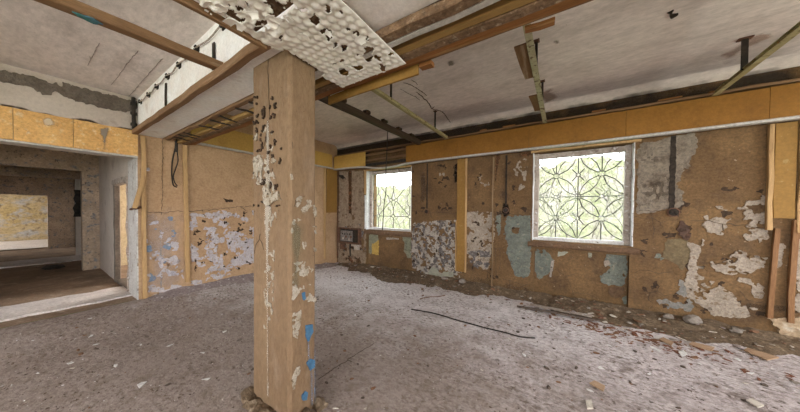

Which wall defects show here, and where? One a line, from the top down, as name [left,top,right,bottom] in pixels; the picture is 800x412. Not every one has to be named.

flaking render [0,70,138,112]
crack [401,80,450,122]
peeling [147,96,282,295]
peeling [291,196,317,234]
peeling [338,158,568,280]
flaking render [636,133,800,337]
peeling [263,250,275,329]
peeling [292,261,316,303]
peeling [600,254,628,286]
peeling [292,310,302,339]
peeling [291,366,301,390]